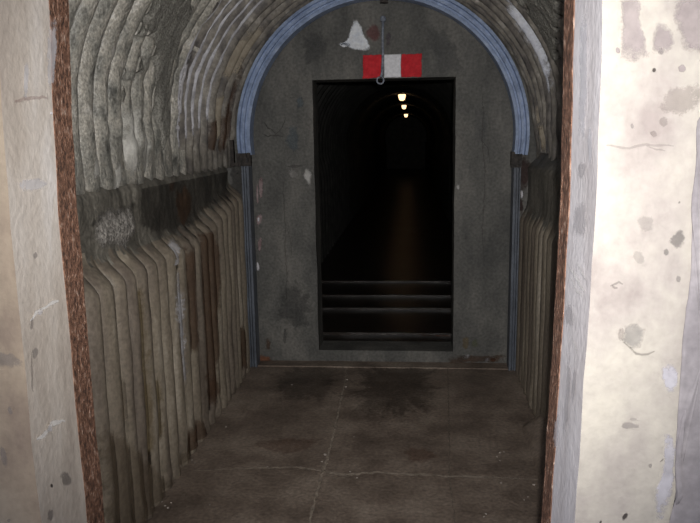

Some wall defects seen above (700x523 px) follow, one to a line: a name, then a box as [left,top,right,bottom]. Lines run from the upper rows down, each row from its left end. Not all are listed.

spalling [669,117,700,523]